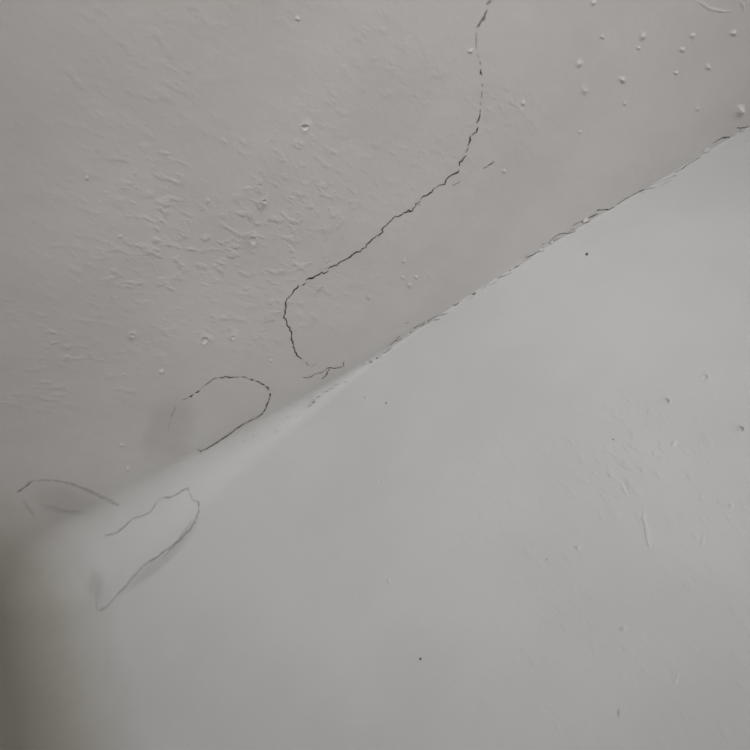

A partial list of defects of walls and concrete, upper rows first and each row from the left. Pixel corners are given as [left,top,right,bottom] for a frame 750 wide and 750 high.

crack [283,63,483,359]